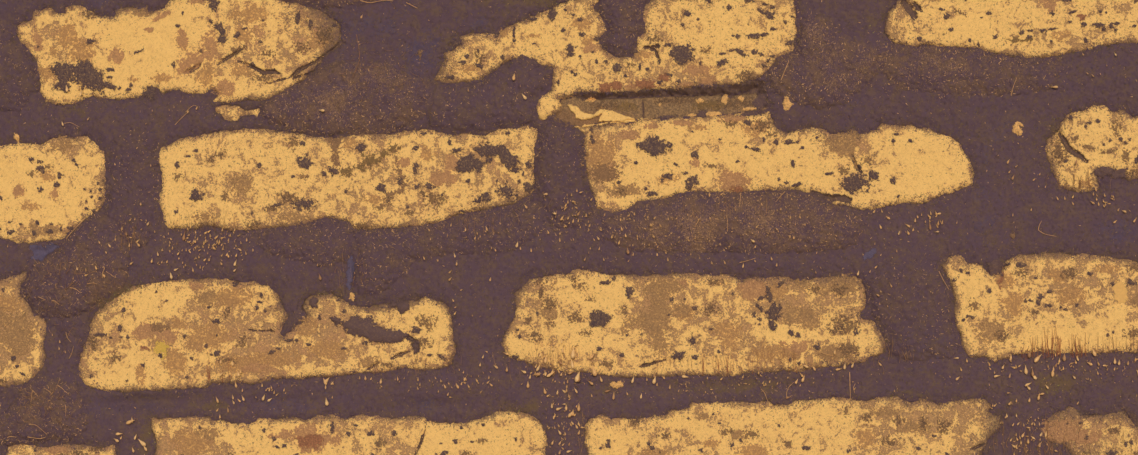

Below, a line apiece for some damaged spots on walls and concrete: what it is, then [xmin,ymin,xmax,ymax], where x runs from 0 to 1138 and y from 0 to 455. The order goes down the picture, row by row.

crack [185,39,346,85]